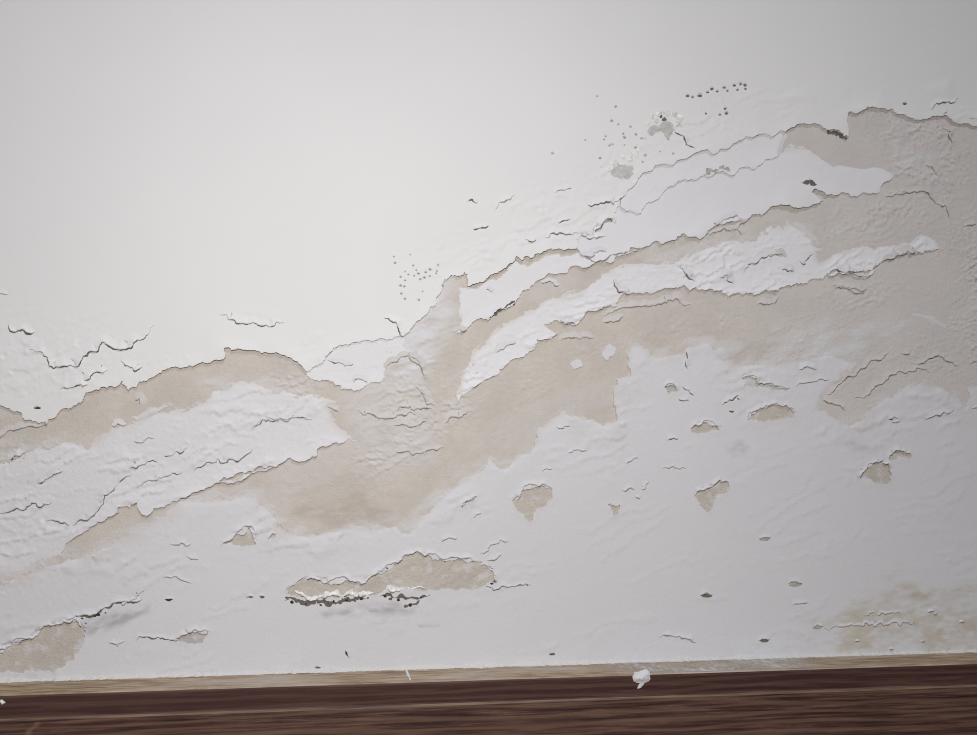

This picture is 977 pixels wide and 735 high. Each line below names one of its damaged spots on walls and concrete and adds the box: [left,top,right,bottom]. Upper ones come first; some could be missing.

spalling [686,81,747,98]
flaking render [0,101,977,584]
spalling [285,547,498,608]
spalling [699,587,713,598]
spalling [0,616,87,673]
spalling [175,624,209,644]